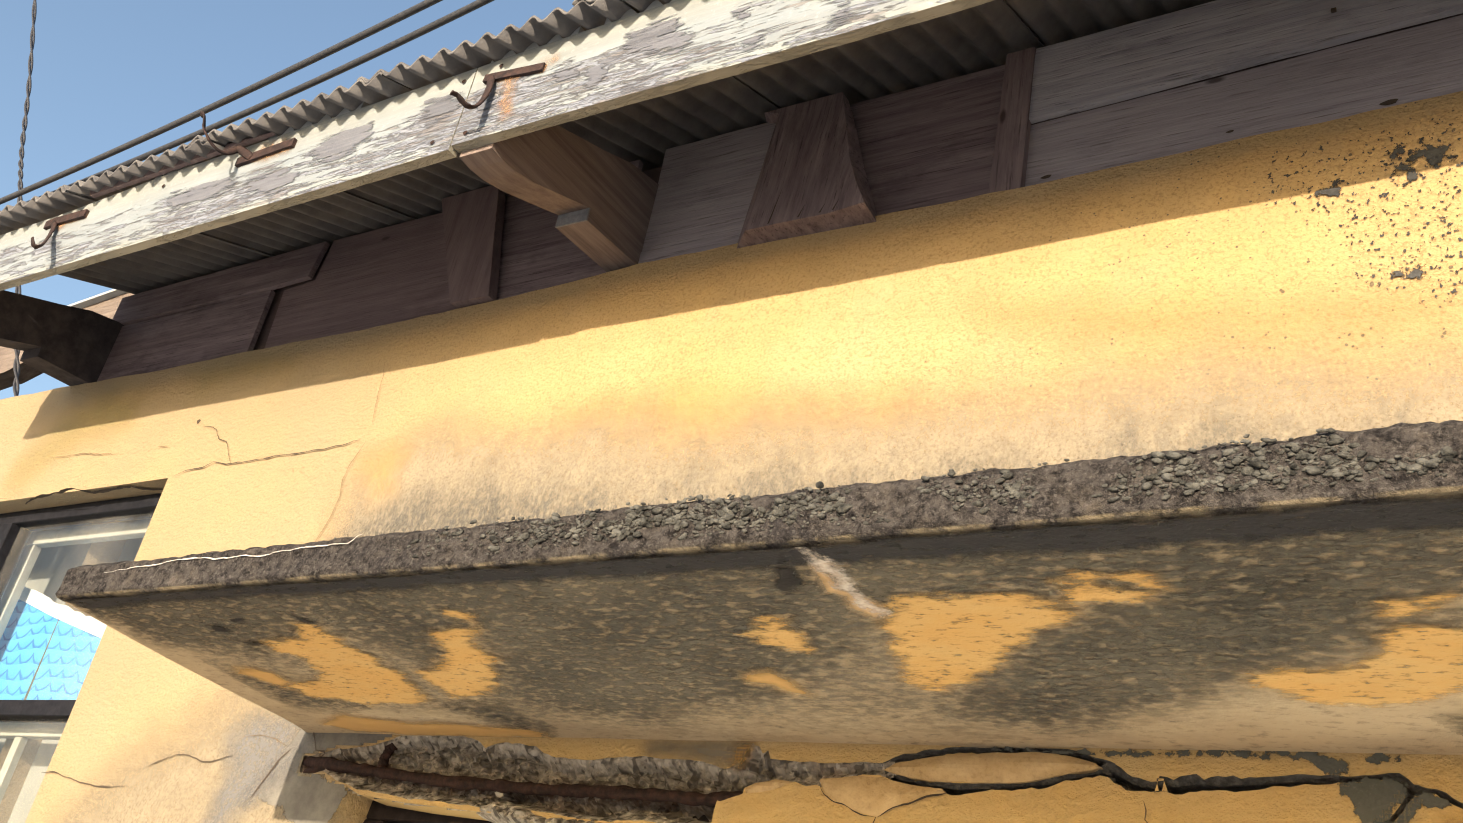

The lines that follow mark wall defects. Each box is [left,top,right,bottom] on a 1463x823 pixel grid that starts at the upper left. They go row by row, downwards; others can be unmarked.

peeling [1261,115,1463,304]
crack [0,363,385,573]
damp [340,368,1463,538]
damp [64,498,1463,823]
spalling [258,729,947,823]
crack [819,747,1463,823]